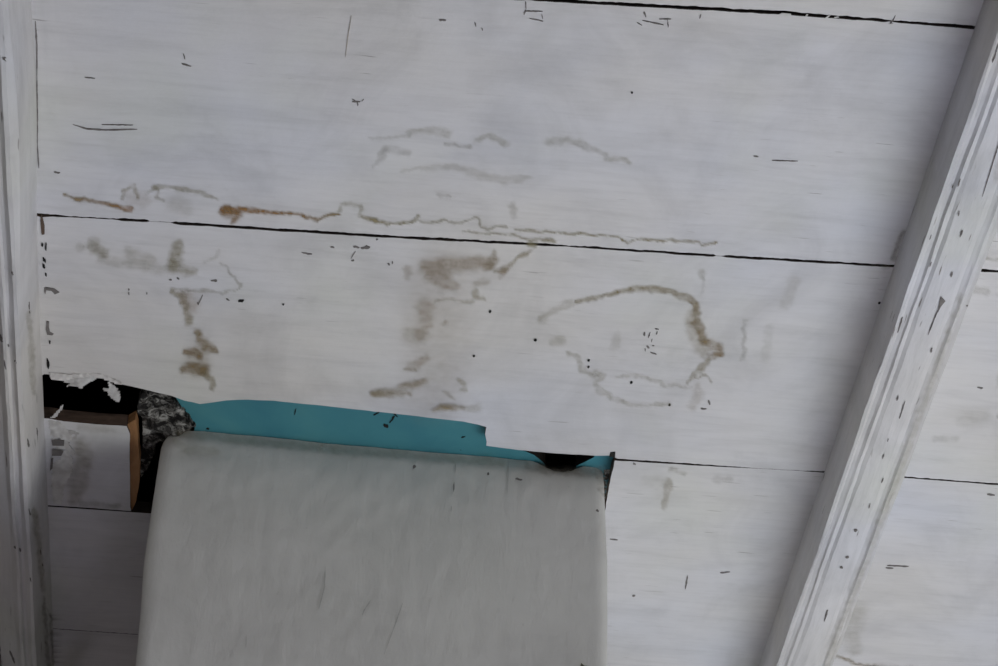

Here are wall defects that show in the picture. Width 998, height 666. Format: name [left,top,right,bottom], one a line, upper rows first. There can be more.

leakage [64,194,133,211]
leakage [220,206,340,222]
leakage [689,301,723,357]
peeling [49,372,122,402]